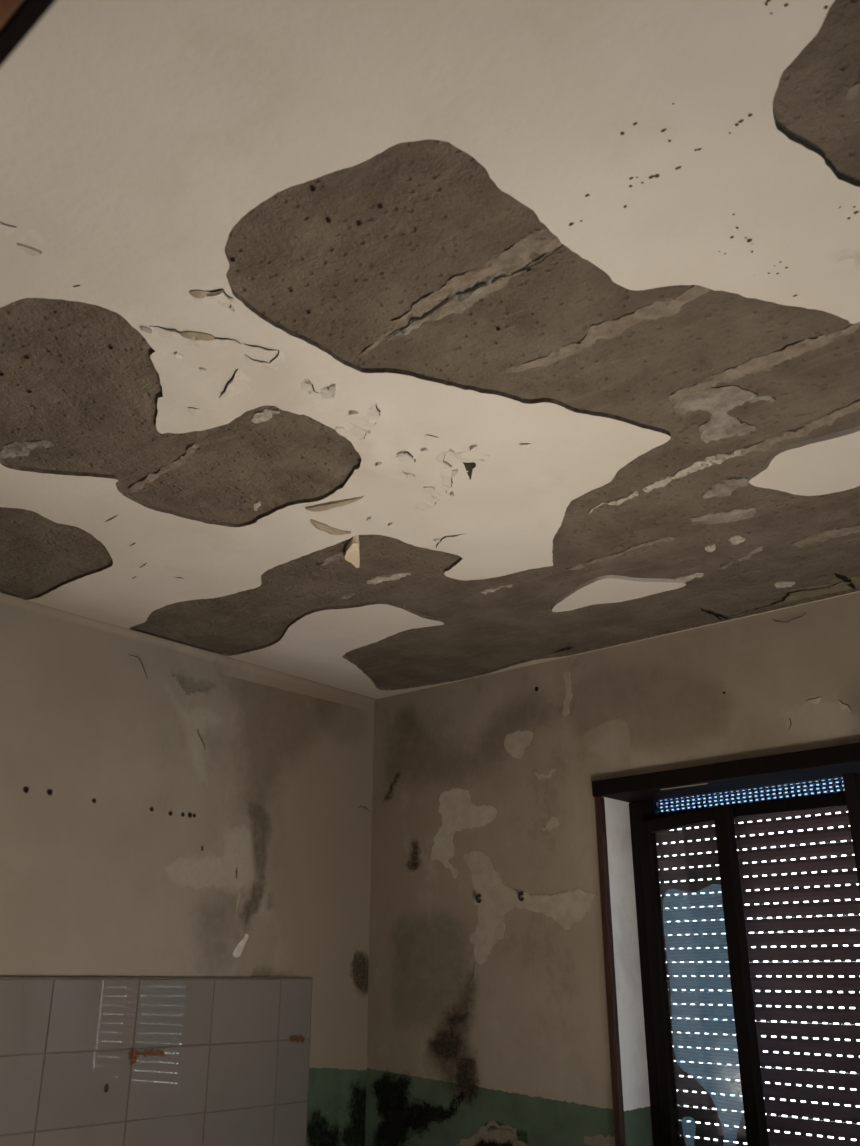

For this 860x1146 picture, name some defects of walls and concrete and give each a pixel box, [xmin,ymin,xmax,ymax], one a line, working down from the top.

spalling [773,0,860,187]
spalling [0,139,860,690]
peeling [504,730,533,759]
peeling [431,788,595,965]
corrosion [129,1048,164,1064]
leakage [307,962,478,1146]
peeling [456,1121,528,1146]